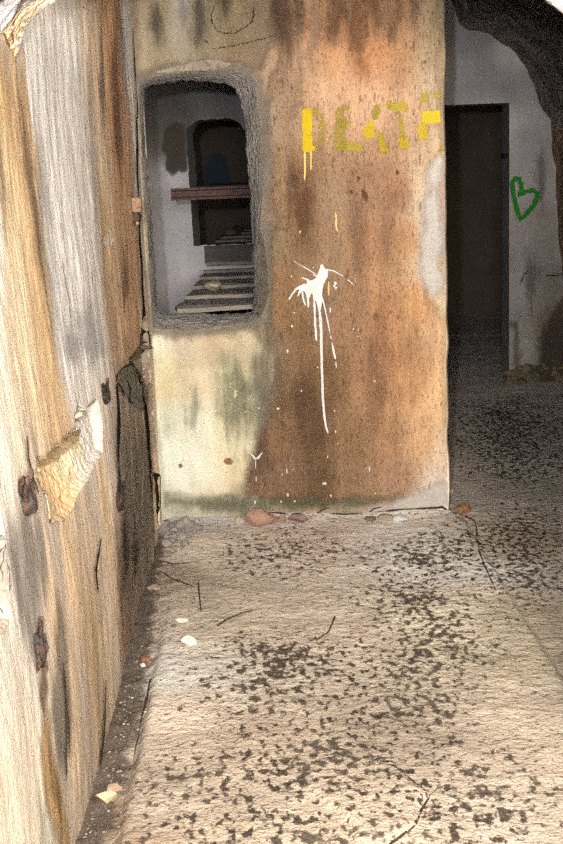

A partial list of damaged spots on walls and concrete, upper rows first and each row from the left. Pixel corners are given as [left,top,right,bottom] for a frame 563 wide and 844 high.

spalling [0,0,55,56]
leakage [88,75,114,252]
leakage [39,159,100,363]
rust [246,0,447,507]
spalling [0,534,11,634]
leakage [10,512,48,654]
leakage [53,597,71,759]
spalling [36,399,103,524]
leakage [118,419,154,626]
leakage [225,367,246,423]
leakage [135,394,563,844]